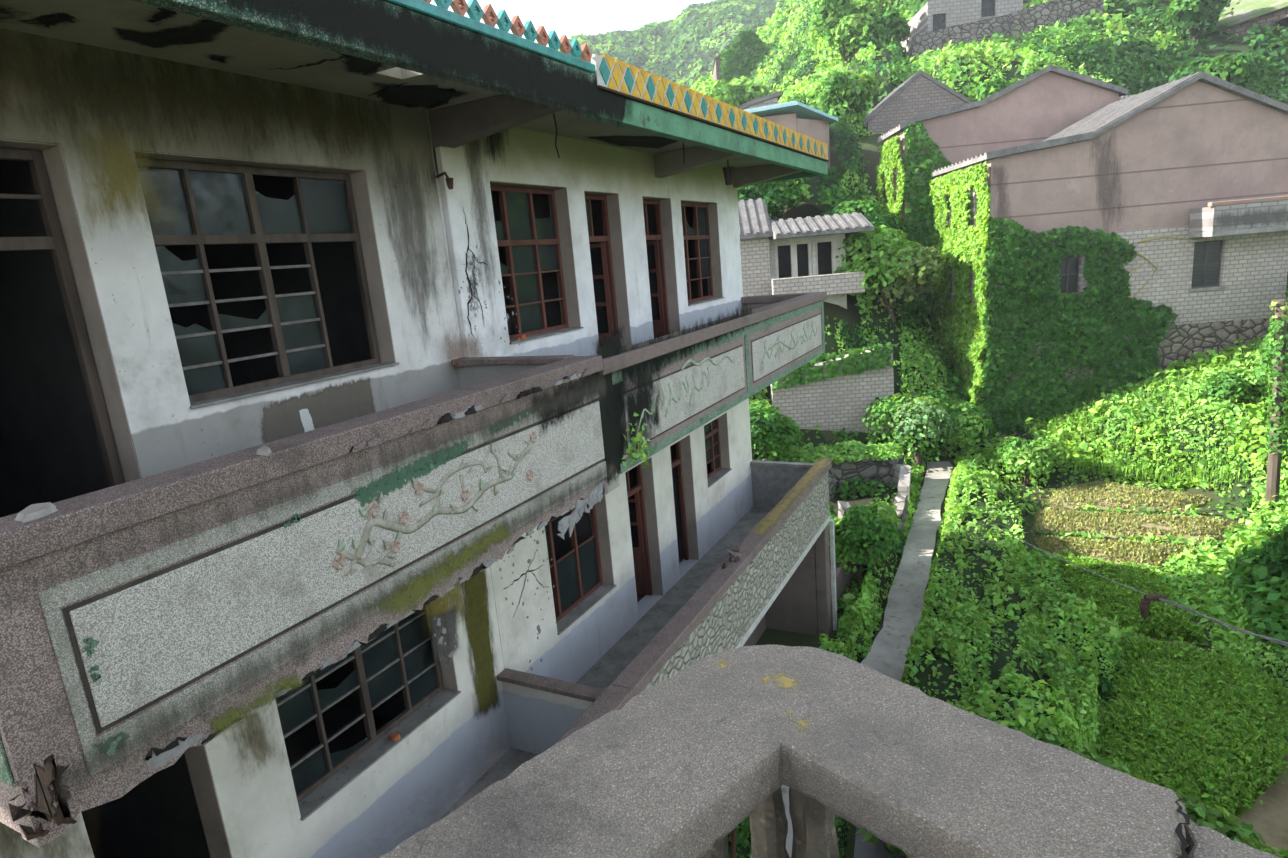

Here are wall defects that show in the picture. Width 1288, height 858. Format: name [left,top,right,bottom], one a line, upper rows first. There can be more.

damp [57,43,390,153]
peeling [337,52,466,109]
crack [463,209,490,347]
peeling [38,368,607,776]
damp [237,713,270,760]
spalling [8,754,77,841]
crack [1175,793,1190,858]